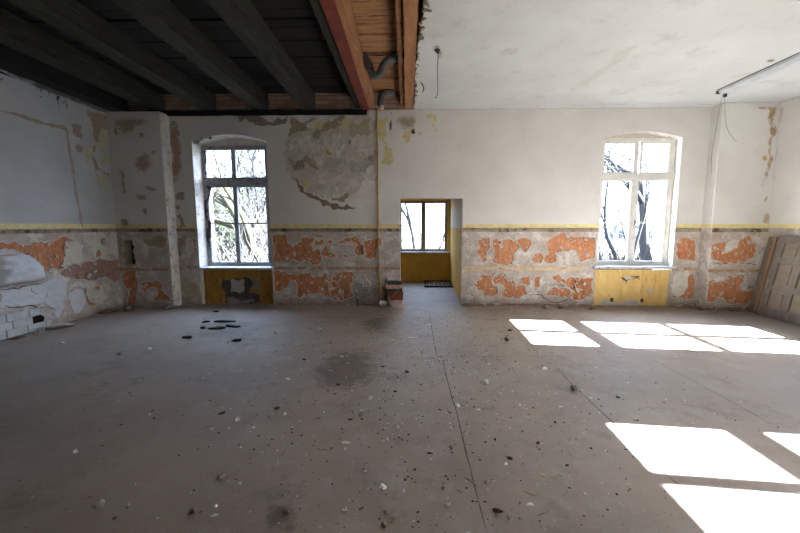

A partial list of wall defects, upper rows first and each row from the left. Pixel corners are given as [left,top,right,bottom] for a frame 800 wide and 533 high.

peeling [71,110,127,193]
peeling [237,107,393,210]
peeling [0,235,171,340]
peeling [221,277,261,304]
spalling [271,233,382,301]
spalling [473,232,653,306]
spalling [671,236,697,300]
spalling [706,234,772,307]